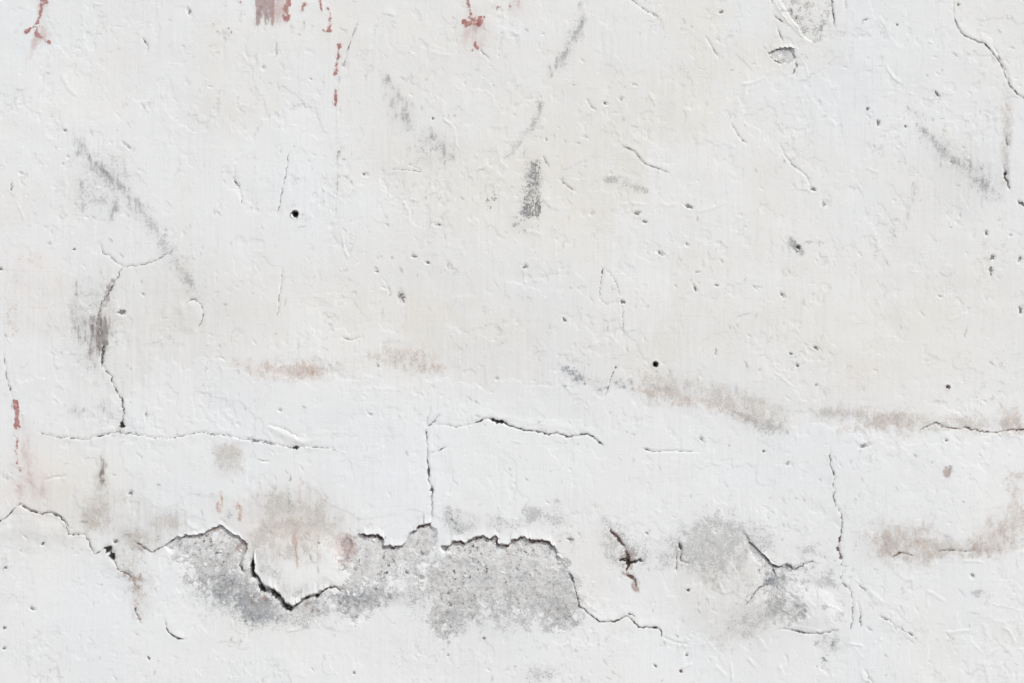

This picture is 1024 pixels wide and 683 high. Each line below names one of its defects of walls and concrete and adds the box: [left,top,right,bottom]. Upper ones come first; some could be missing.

corrosion [24,0,51,44]
corrosion [282,0,341,75]
corrosion [462,0,485,27]
crack [42,250,337,452]
crack [426,417,603,505]
crack [920,422,1024,433]
crack [0,504,132,577]
flaking render [164,514,585,644]
crack [610,529,643,588]
crack [746,455,913,636]